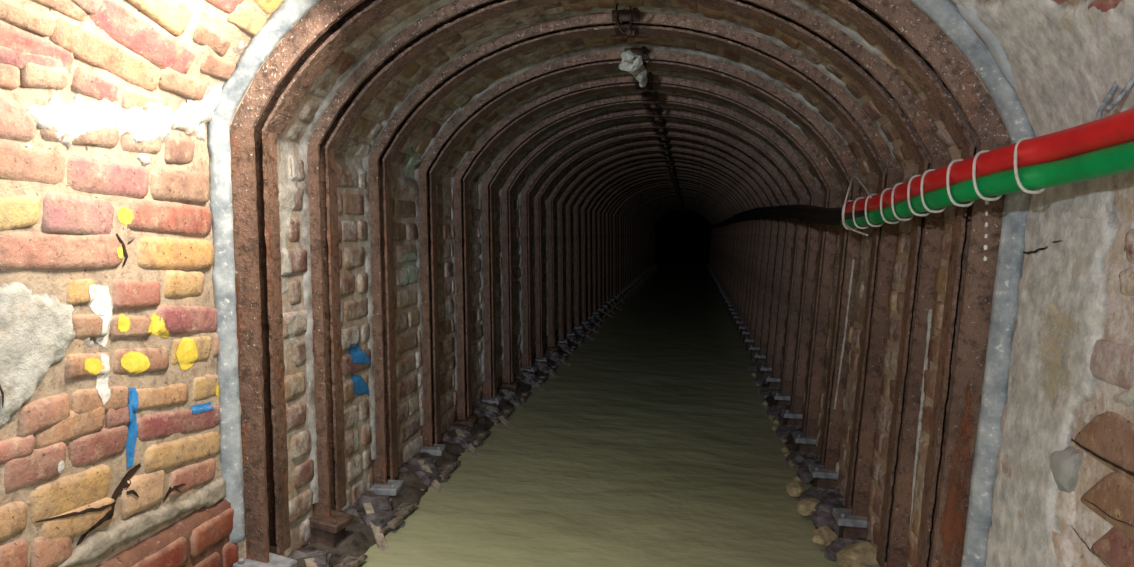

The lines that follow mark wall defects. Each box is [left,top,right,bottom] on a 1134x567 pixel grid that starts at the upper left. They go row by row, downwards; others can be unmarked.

crack [116,234,134,267]
crack [1071,438,1134,476]
crack [35,463,186,545]
crack [1084,499,1134,527]